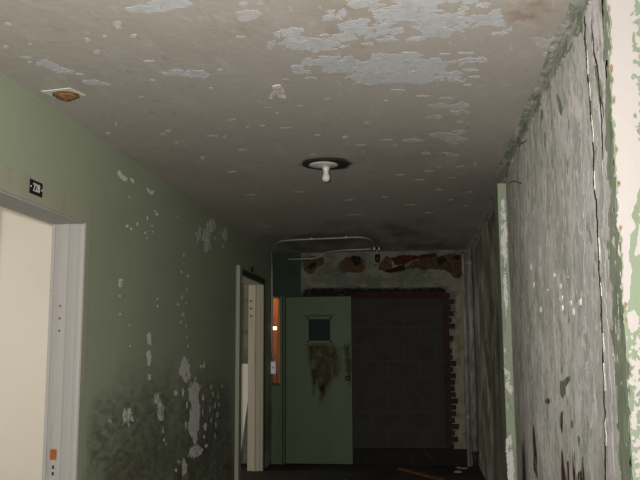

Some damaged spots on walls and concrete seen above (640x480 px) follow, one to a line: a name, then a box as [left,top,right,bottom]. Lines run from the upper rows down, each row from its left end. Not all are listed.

peeling [125,0,193,13]
peeling [267,0,525,99]
spalling [338,255,366,273]
spalling [378,253,462,279]
peeling [500,199,508,314]
crack [584,16,607,480]
peeling [593,0,640,480]
peeling [504,368,513,395]
peeling [122,407,138,427]
peeling [154,392,167,446]
peeling [174,356,220,475]
peeling [506,434,515,480]